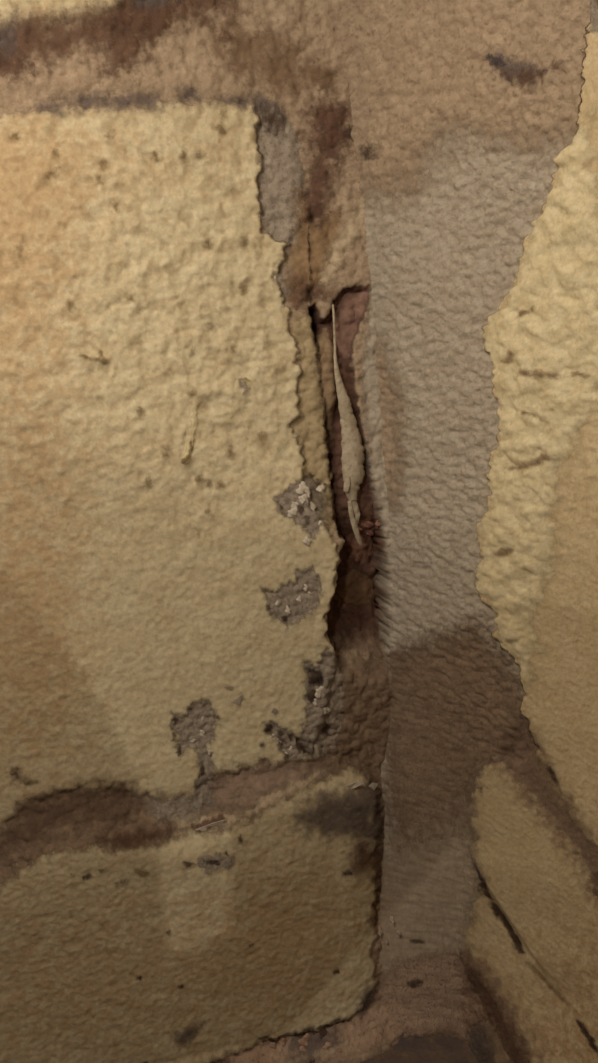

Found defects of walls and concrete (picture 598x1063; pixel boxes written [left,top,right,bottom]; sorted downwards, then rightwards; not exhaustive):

leakage [0,0,238,76]
leakage [488,55,556,83]
flaking render [0,0,395,914]
flaking render [215,0,598,1063]
leakage [297,784,382,873]
crack [457,949,541,1063]
crack [475,867,598,1053]